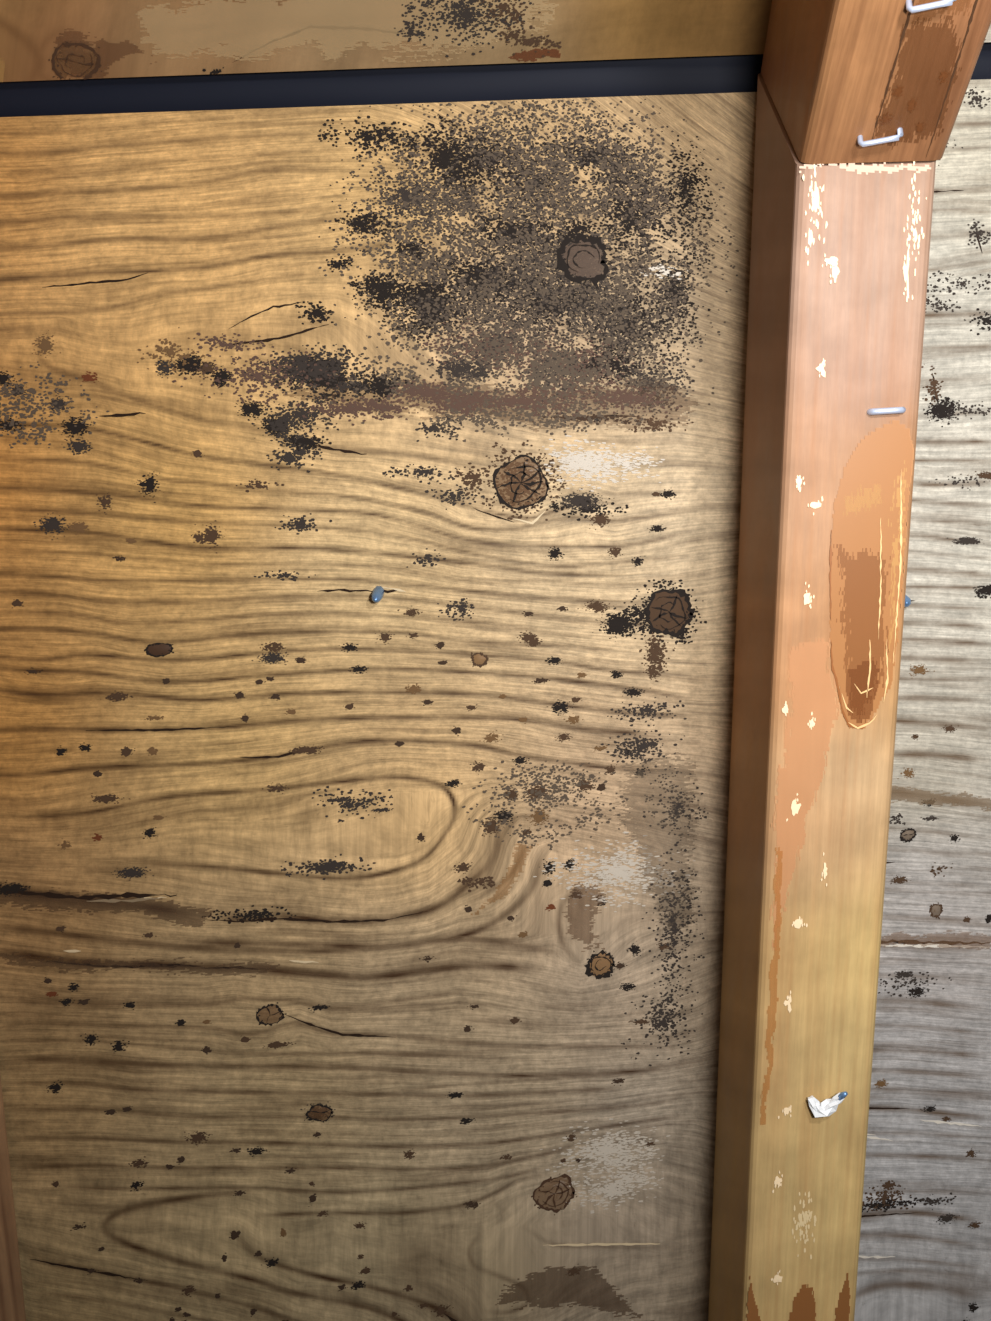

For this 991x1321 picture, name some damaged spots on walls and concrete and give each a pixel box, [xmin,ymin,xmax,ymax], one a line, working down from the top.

water stain [394,0,562,57]
water stain [967,219,991,249]
water stain [137,109,717,492]
mould [926,270,991,335]
mould [922,364,991,427]
water stain [652,489,677,500]
water stain [770,420,937,951]
water stain [444,760,486,789]
mould [478,779,558,837]
water stain [557,579,708,1066]
water stain [542,858,579,887]
water stain [788,1284,816,1321]